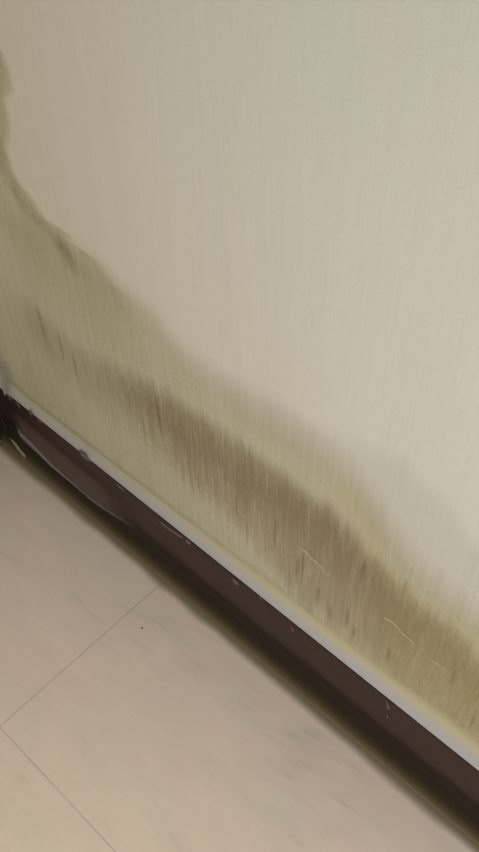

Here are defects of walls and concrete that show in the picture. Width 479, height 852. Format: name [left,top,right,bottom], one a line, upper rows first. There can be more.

damp [133,390,479,746]